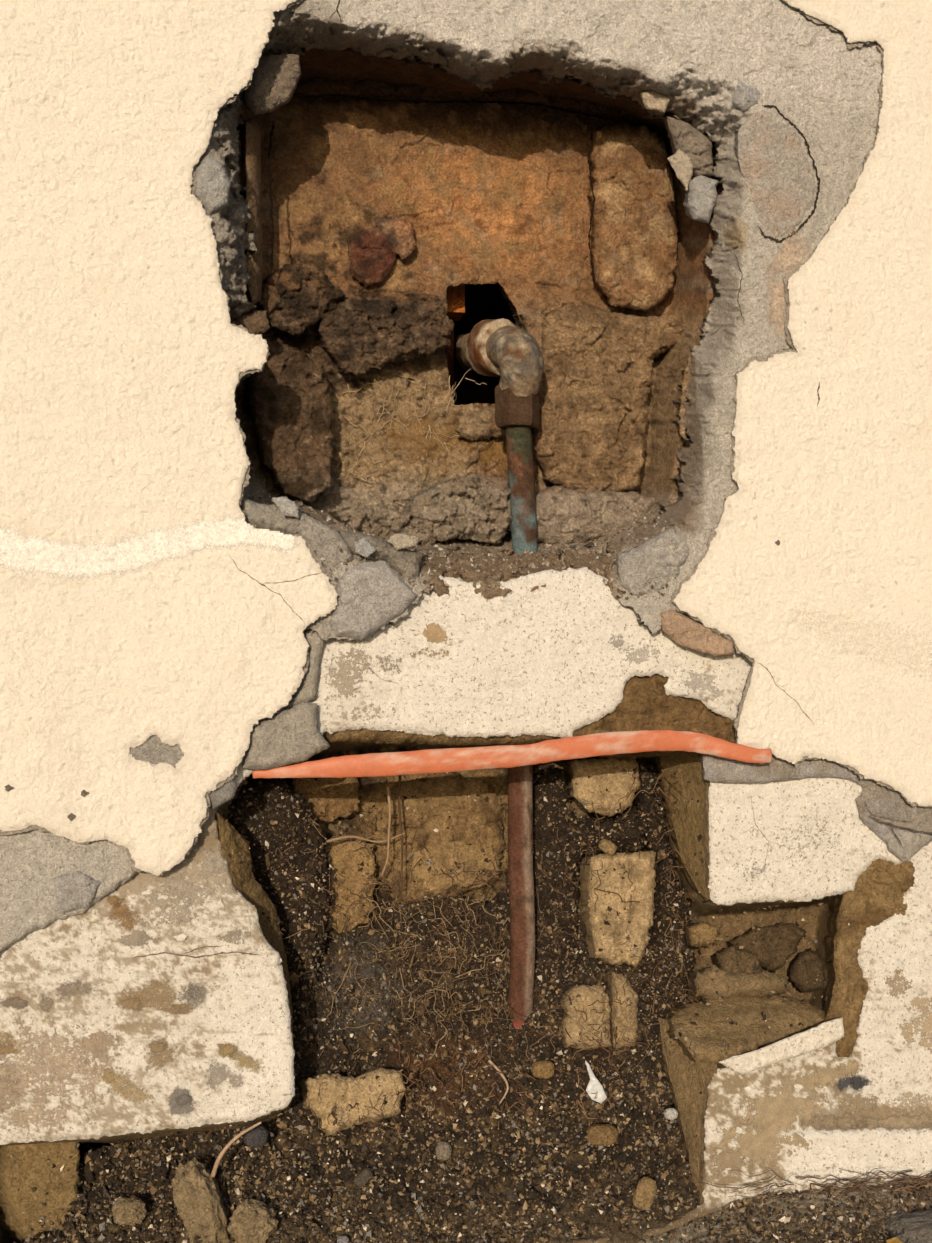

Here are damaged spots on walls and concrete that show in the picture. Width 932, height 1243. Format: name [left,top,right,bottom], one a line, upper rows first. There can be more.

crack [733,251,744,320]
crack [759,105,821,243]
spalling [0,0,883,1048]
rust [379,415,508,472]
spalling [531,751,932,1222]
spalling [0,1009,406,1243]